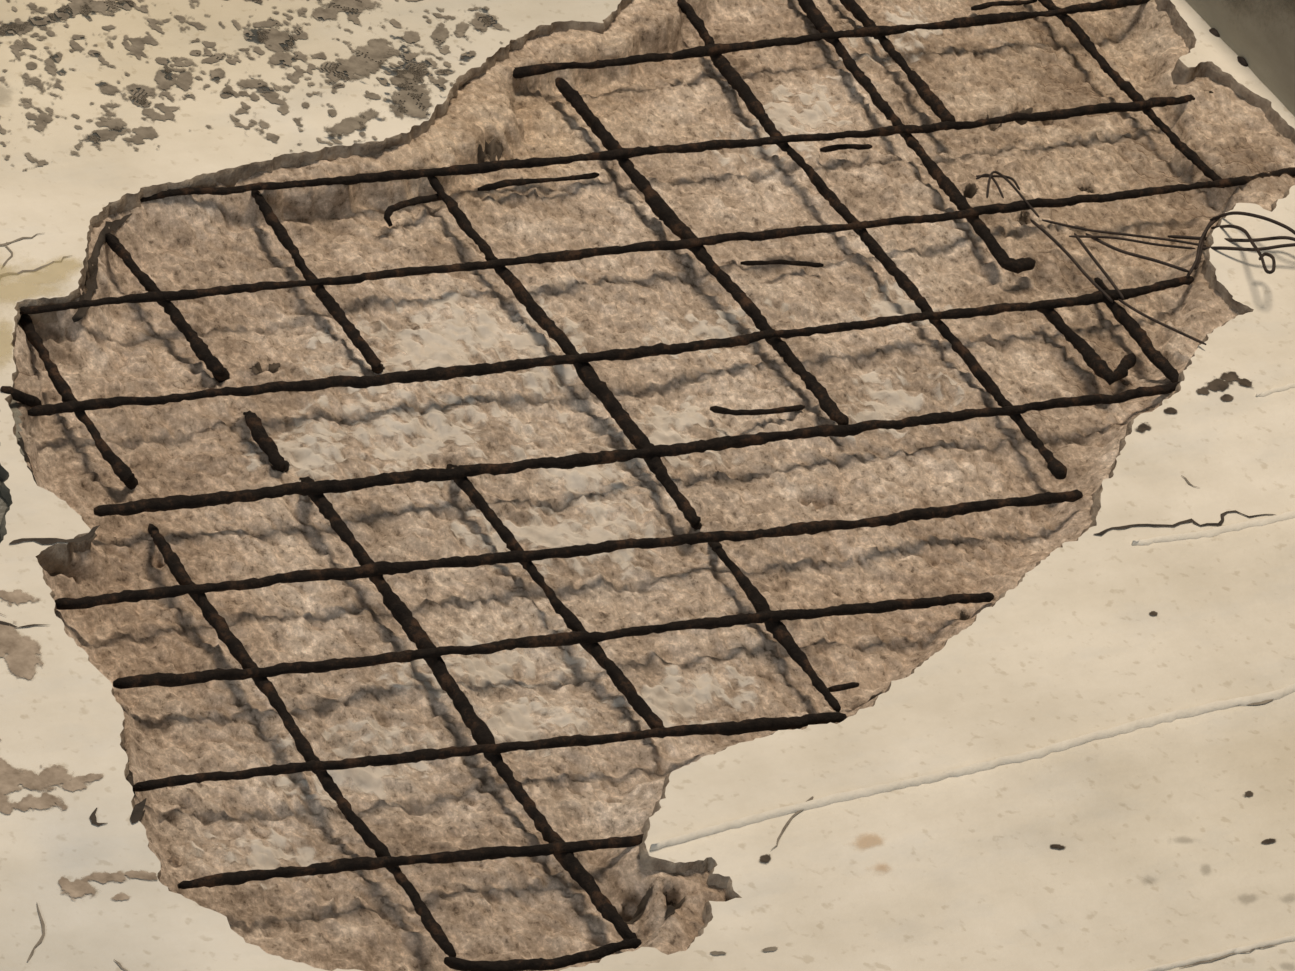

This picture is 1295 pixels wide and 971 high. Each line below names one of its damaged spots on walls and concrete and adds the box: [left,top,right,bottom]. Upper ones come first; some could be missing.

peeling [0,0,206,132]
peeling [69,0,508,156]
peeling [0,119,49,171]
spalling [1196,371,1253,401]
crack [1094,510,1275,536]
crack [0,613,45,628]
peeling [0,758,103,814]
peeling [58,870,158,900]
spalling [544,959,600,971]